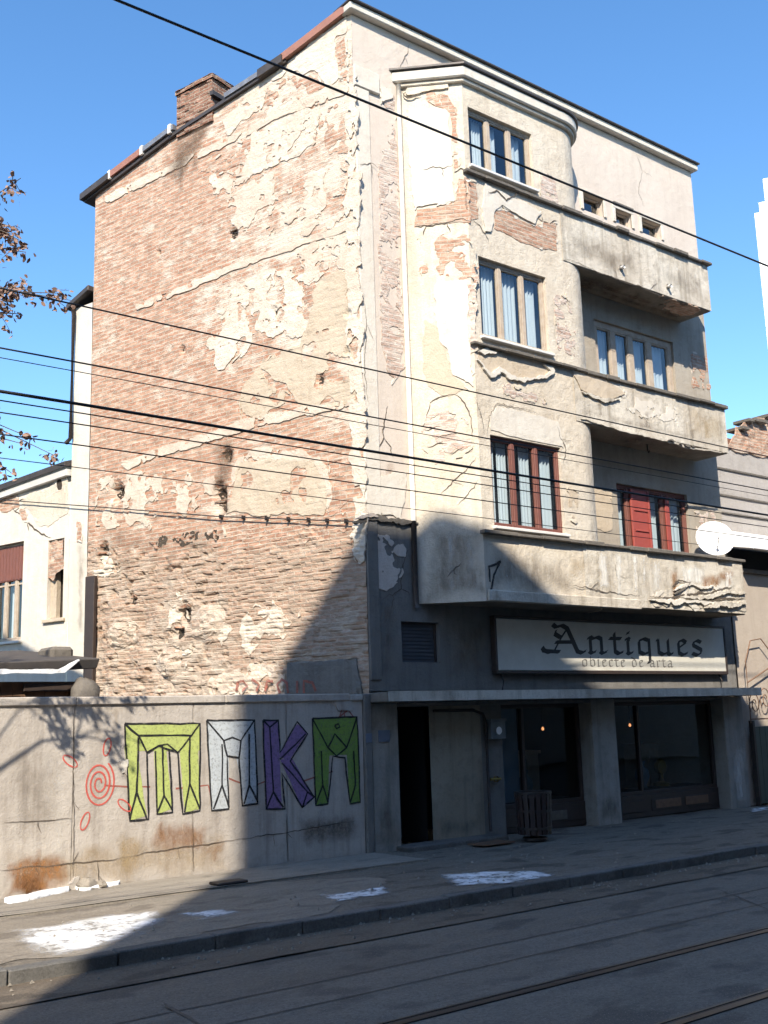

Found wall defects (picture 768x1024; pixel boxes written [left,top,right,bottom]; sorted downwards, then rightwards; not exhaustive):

flaking render [94,16,407,591]
flaking render [378,83,564,448]
flaking render [553,293,576,356]
flaking render [167,591,193,669]
flaking render [207,600,301,695]
flaking render [648,579,747,612]
crack [0,710,354,880]